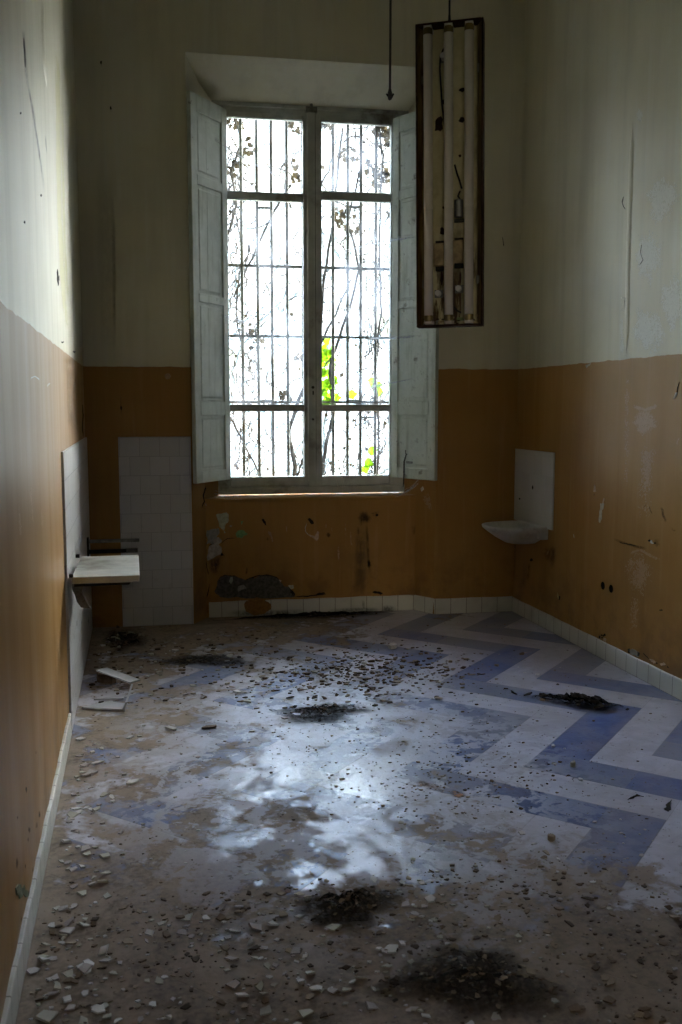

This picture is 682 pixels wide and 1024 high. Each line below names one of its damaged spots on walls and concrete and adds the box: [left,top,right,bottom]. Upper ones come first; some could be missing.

peeling [206,512,248,560]
flaking render [214,574,295,615]